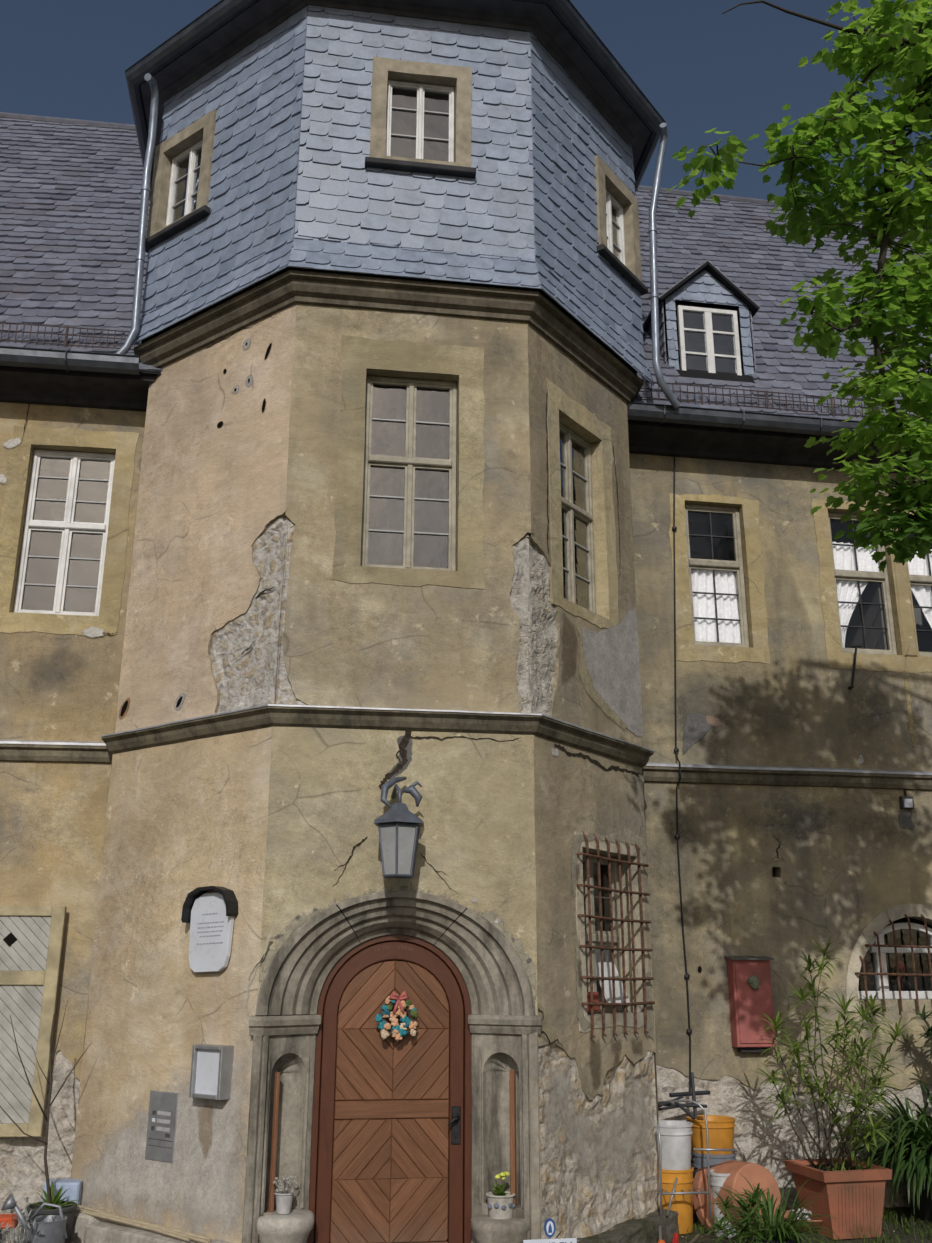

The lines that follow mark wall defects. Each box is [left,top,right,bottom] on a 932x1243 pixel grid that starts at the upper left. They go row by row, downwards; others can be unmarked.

spalling [232,375,253,394]
spalling [210,517,307,713]
spalling [510,534,558,716]
crack [379,730,521,789]
crack [551,743,644,782]
crack [333,837,367,886]
spalling [259,896,349,982]
flaking render [365,886,932,1239]
flaking render [0,1050,80,1243]